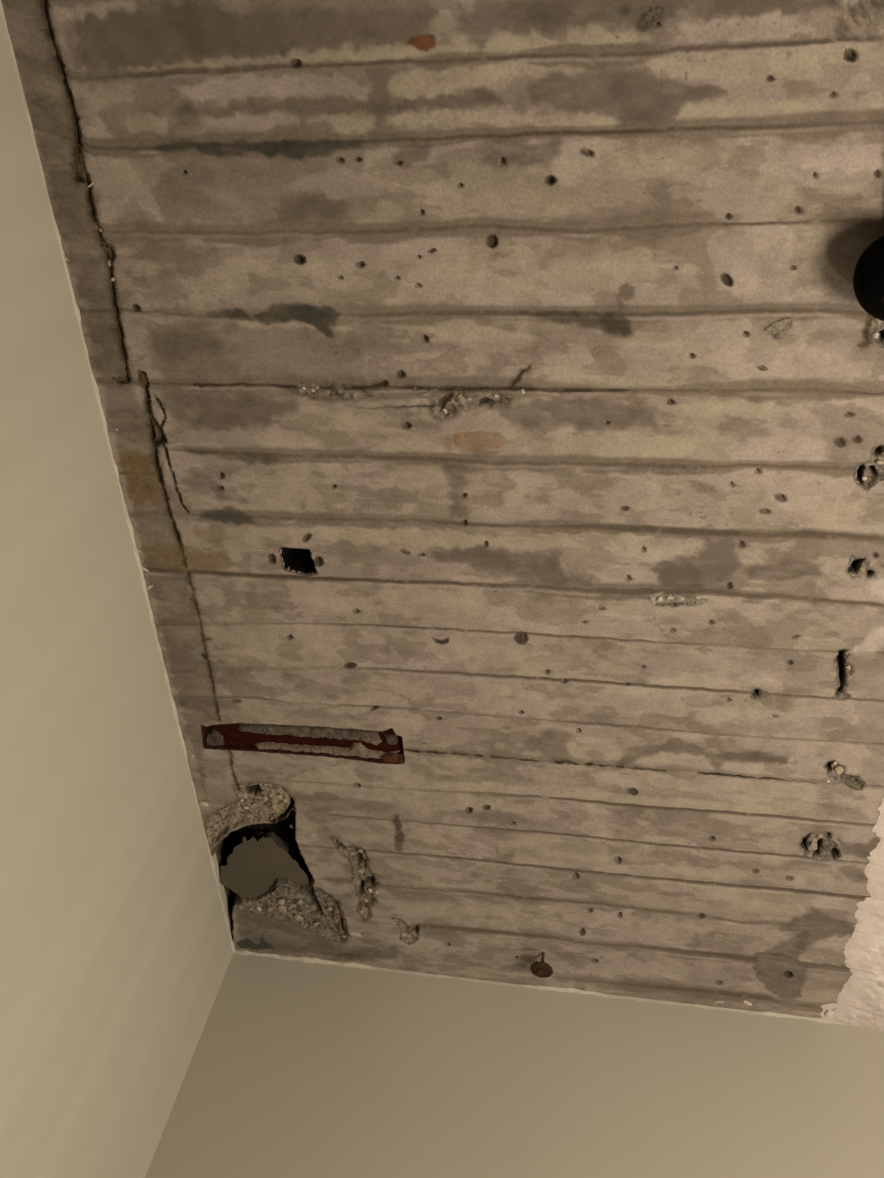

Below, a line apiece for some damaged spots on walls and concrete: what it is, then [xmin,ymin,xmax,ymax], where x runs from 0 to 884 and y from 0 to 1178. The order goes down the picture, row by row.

leakage [226,305,338,338]
crack [40,0,221,722]
spalling [854,445,884,491]
spalling [845,555,877,581]
spalling [833,649,855,700]
rust [201,723,405,764]
crack [229,751,244,795]
spalling [824,760,865,790]
spalling [199,783,380,943]
spalling [799,832,842,861]
peeling [820,797,884,1032]
leakage [754,912,853,998]